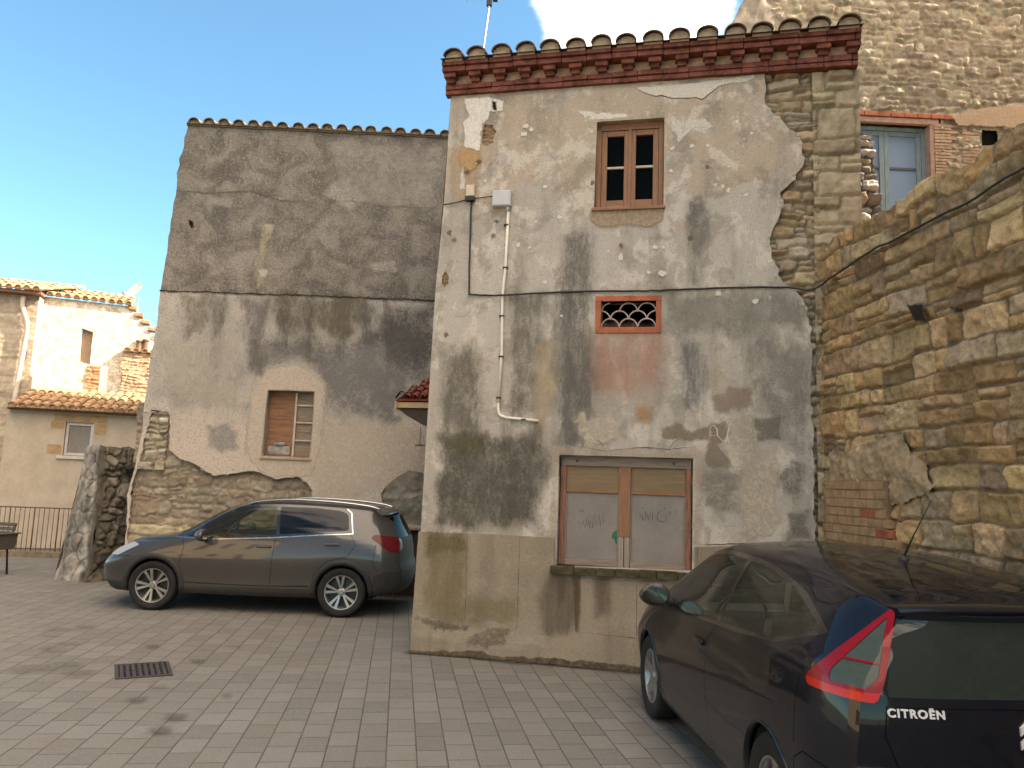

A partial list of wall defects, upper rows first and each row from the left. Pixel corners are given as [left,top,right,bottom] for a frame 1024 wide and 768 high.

peeling [459,97,504,189]
crack [636,82,737,100]
damp [244,295,434,422]
spalling [635,73,824,541]
spalling [128,402,313,547]
damp [428,349,549,553]